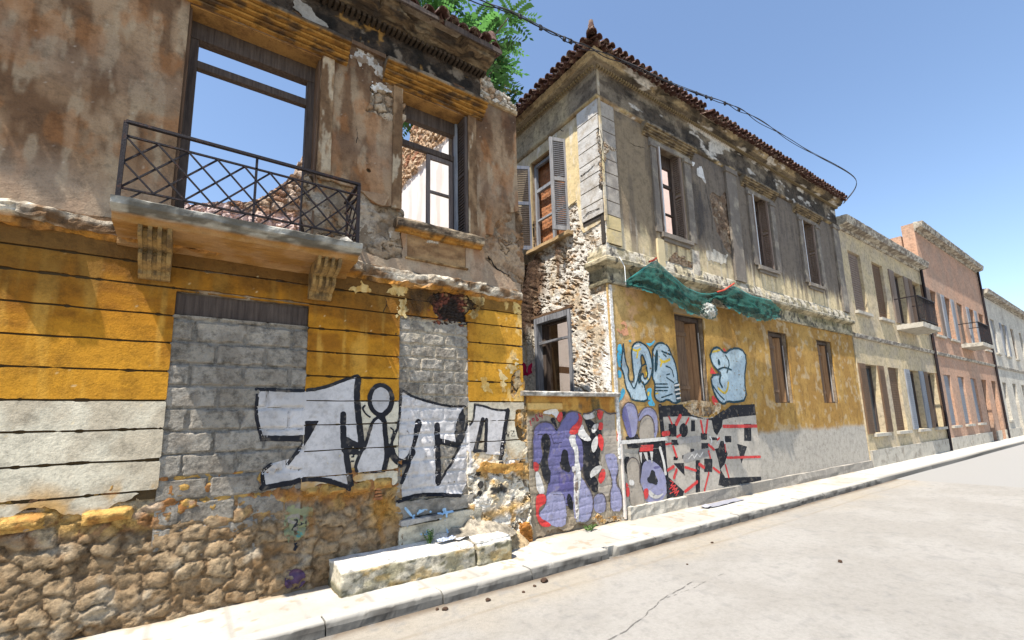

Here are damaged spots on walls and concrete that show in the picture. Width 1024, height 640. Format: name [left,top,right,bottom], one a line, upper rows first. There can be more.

spalling [350,48,406,123]
peeling [349,281,371,294]
peeling [387,284,409,318]
spalling [466,203,629,542]
spalling [0,460,403,640]